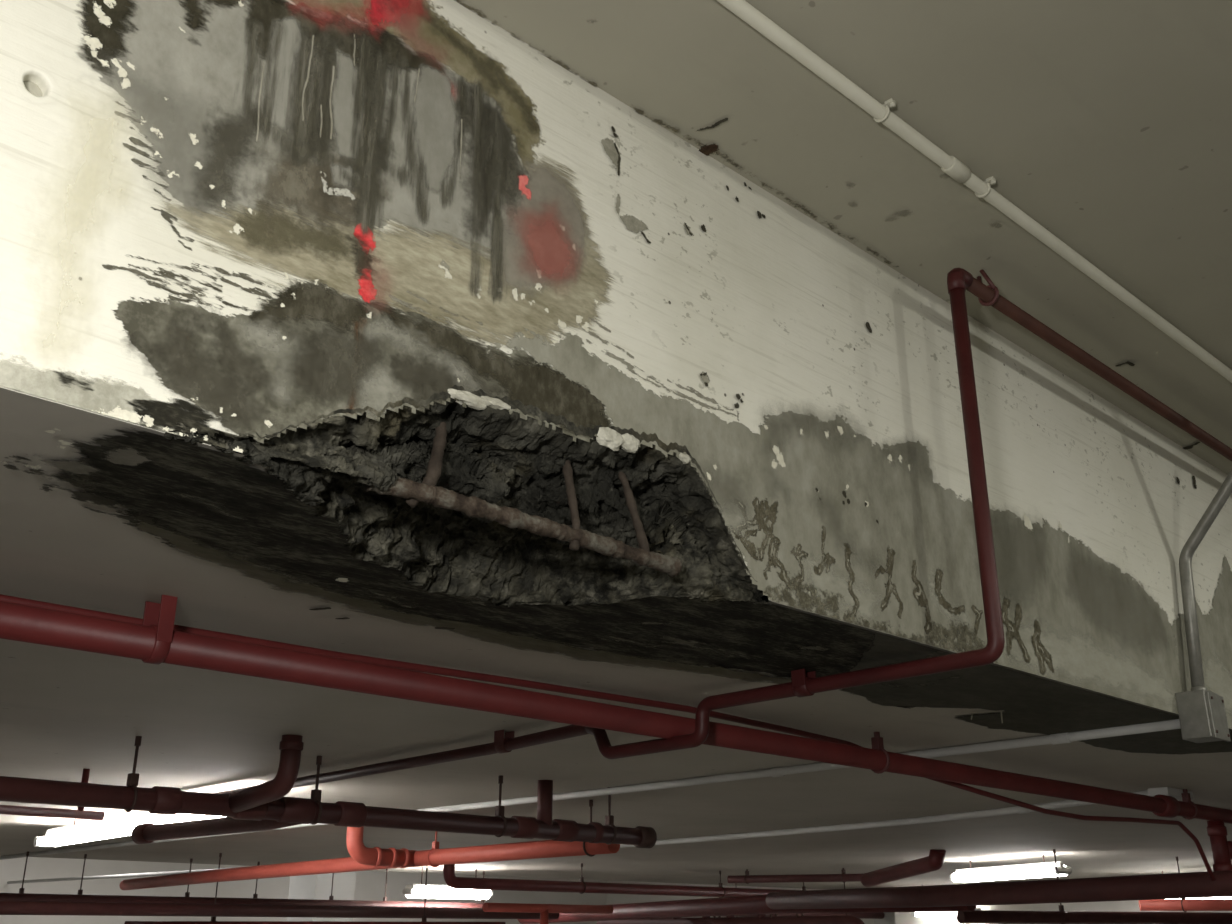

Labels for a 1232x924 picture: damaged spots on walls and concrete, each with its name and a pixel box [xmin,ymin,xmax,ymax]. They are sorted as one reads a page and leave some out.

leakage [1,0,987,684]
spalling [0,356,768,607]
crack [727,498,1054,675]
leakage [841,509,1232,754]